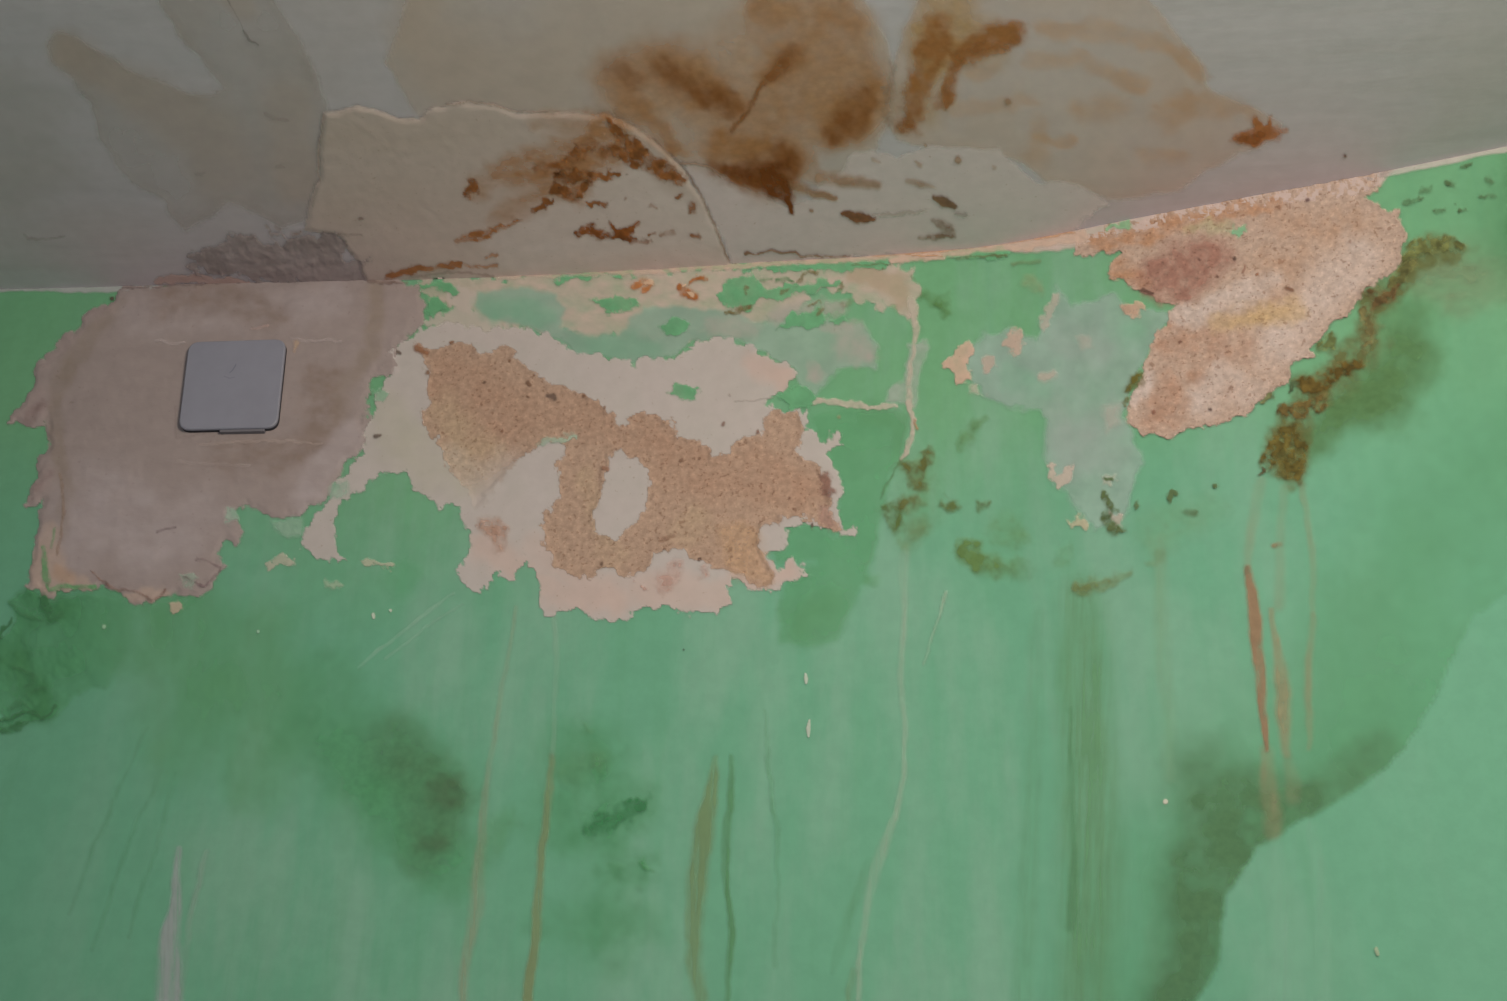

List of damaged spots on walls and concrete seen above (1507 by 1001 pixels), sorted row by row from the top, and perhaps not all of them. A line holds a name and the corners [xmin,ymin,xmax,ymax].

damp [50,34,324,225]
damp [387,0,751,156]
corrosion [386,0,1022,278]
damp [824,0,1279,198]
peeling [278,102,1507,622]
damp [1260,235,1488,481]
peeling [266,553,294,570]
corrosion [1245,565,1288,751]
damp [1328,638,1436,777]
damp [1153,773,1325,1001]